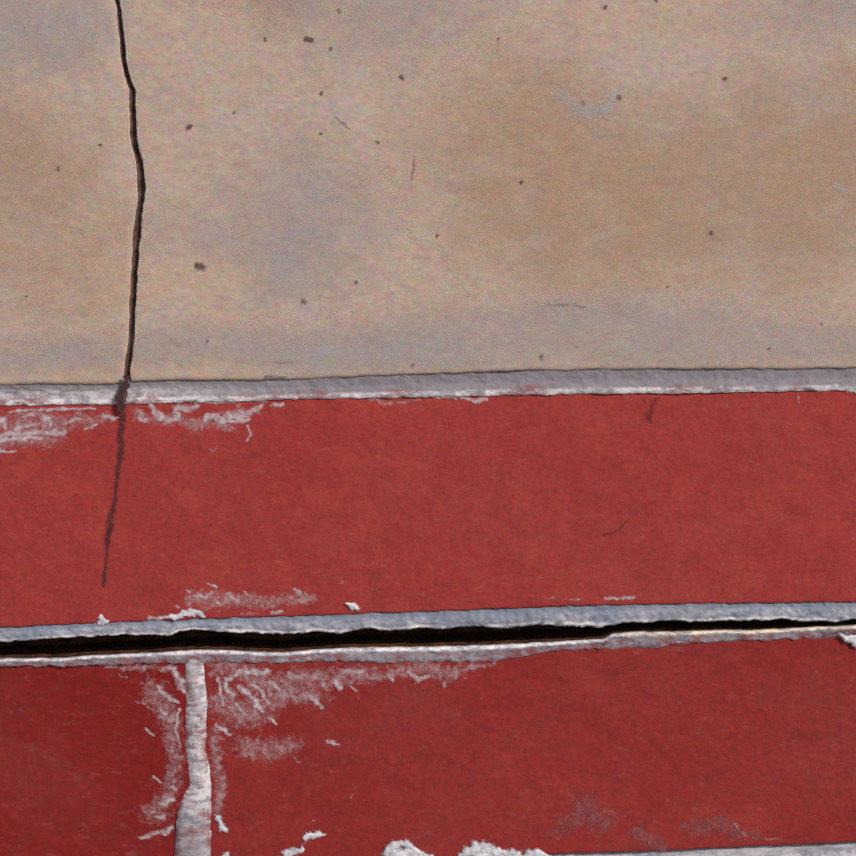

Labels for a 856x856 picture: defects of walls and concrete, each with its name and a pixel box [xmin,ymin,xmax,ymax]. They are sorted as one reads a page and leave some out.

crack [102,0,146,586]
crack [0,619,856,658]
efflorescence [153,666,187,748]
efflorescence [216,666,286,725]
efflorescence [288,669,365,691]